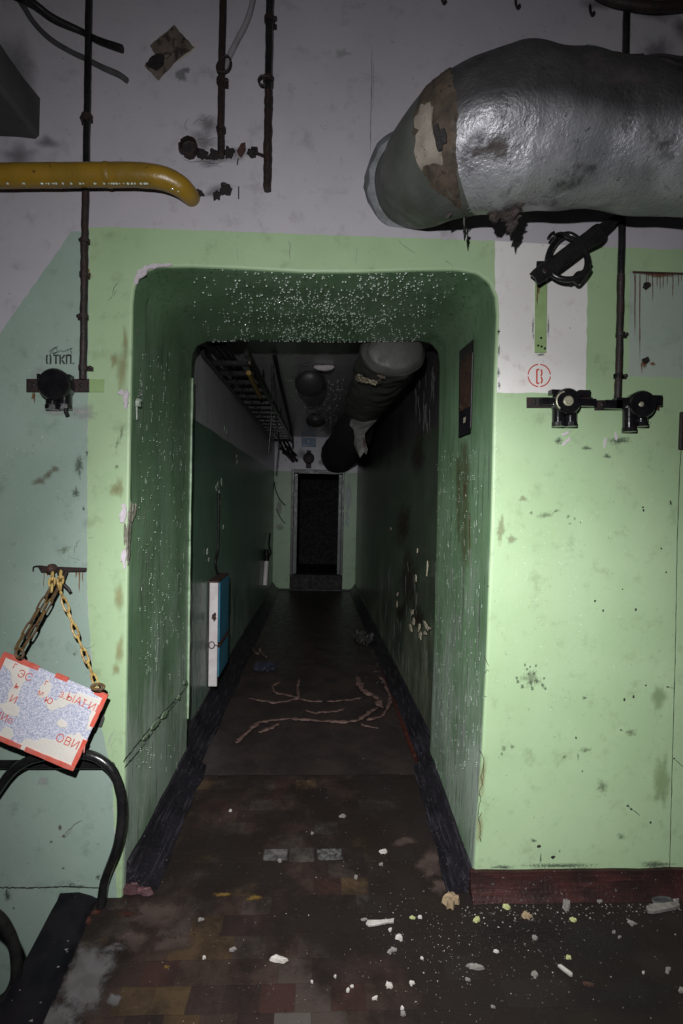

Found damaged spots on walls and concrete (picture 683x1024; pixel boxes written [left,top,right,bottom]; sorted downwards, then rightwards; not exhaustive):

spalling [134,263,173,285]
corrosion [633,271,683,343]
spalling [117,389,142,420]
peeling [119,500,137,569]
peeling [409,609,431,639]
crack [0,883,99,899]